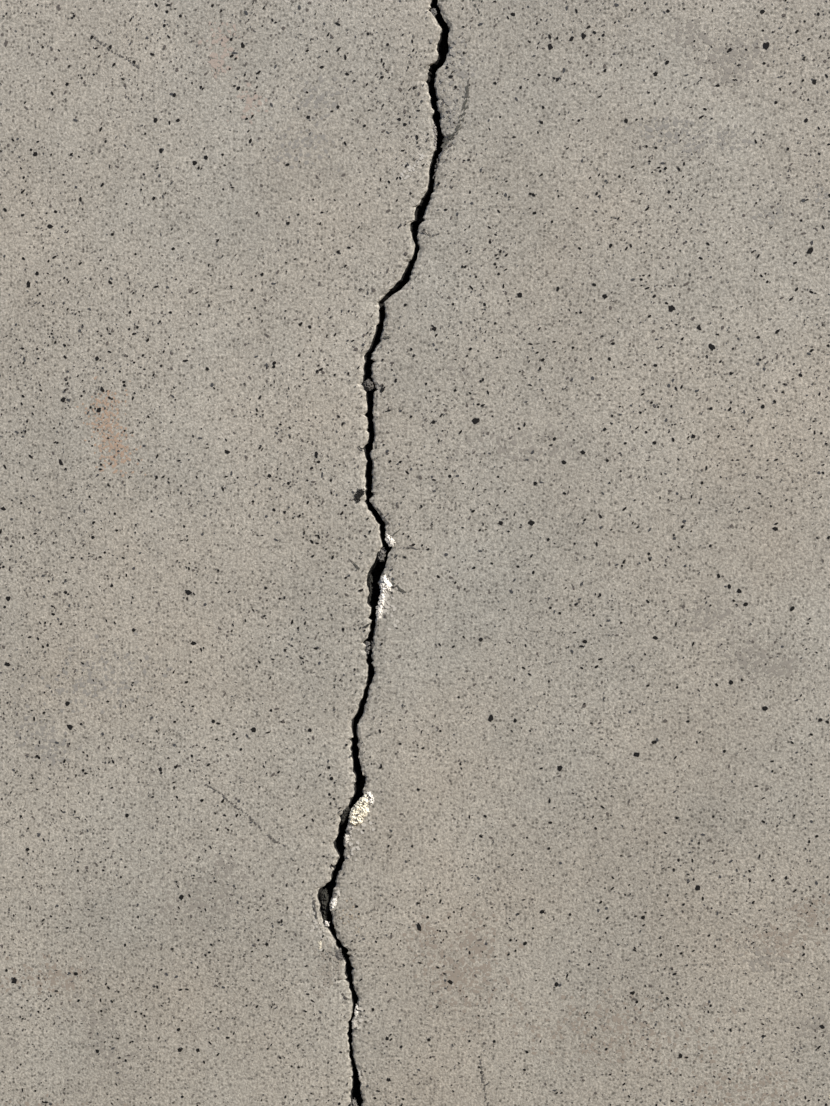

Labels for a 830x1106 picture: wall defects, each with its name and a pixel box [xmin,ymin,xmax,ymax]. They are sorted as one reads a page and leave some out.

crack [312,0,470,1106]